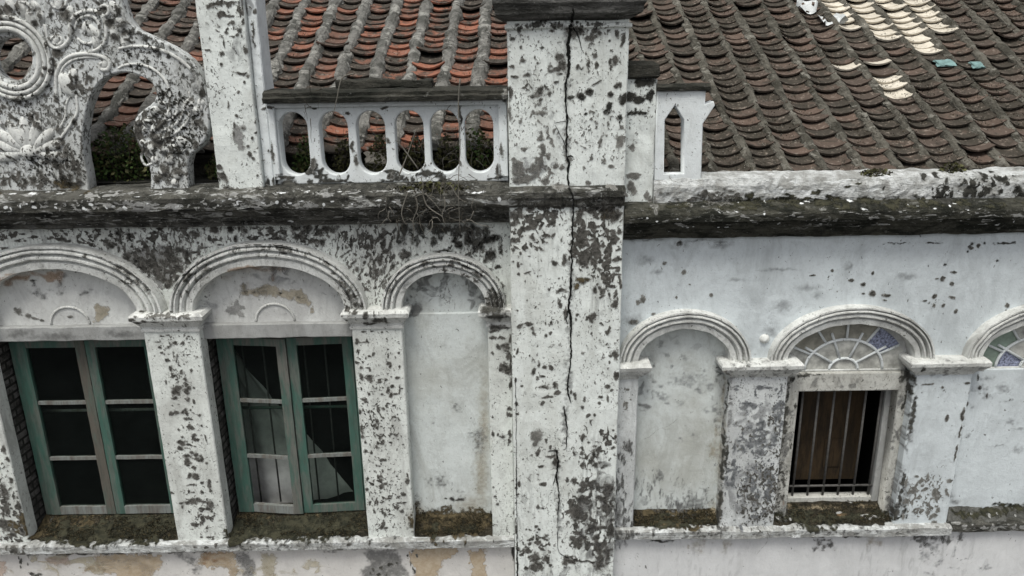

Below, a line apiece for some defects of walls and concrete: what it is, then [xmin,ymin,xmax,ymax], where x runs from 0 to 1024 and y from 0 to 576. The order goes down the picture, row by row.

peeling [0,0,757,576]
crack [548,8,582,561]
peeling [714,384,791,534]
peeling [945,402,969,461]